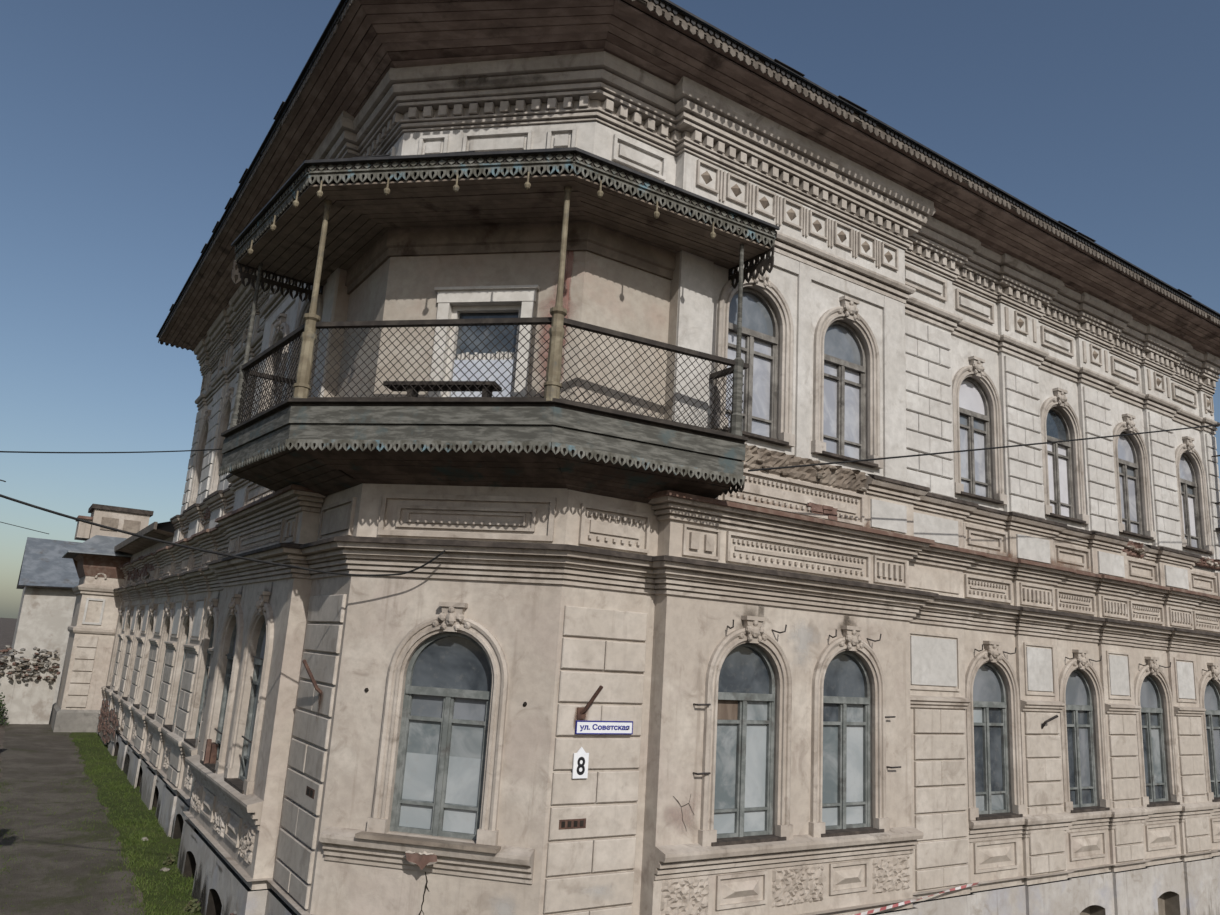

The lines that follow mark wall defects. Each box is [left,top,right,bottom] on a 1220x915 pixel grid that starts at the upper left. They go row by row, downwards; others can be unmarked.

crack [419,872,429,915]